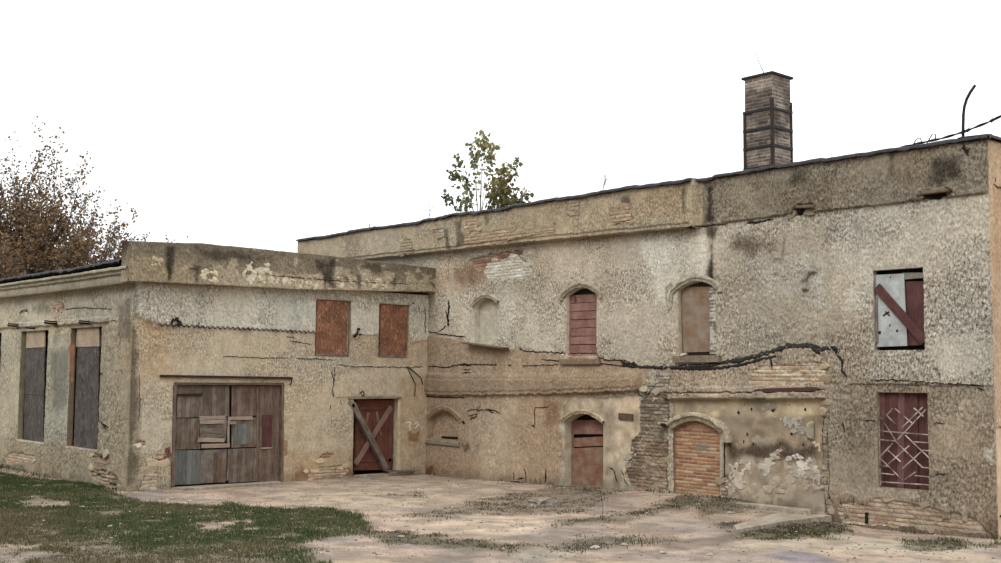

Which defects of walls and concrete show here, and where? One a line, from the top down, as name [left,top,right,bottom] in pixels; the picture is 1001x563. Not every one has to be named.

damp [932,159,958,186]
damp [317,259,336,284]
flaking render [463,214,557,282]
crack [273,275,464,337]
crack [224,336,563,424]
flaking render [89,449,125,488]
flaking render [621,368,673,492]
flaking render [714,362,989,534]